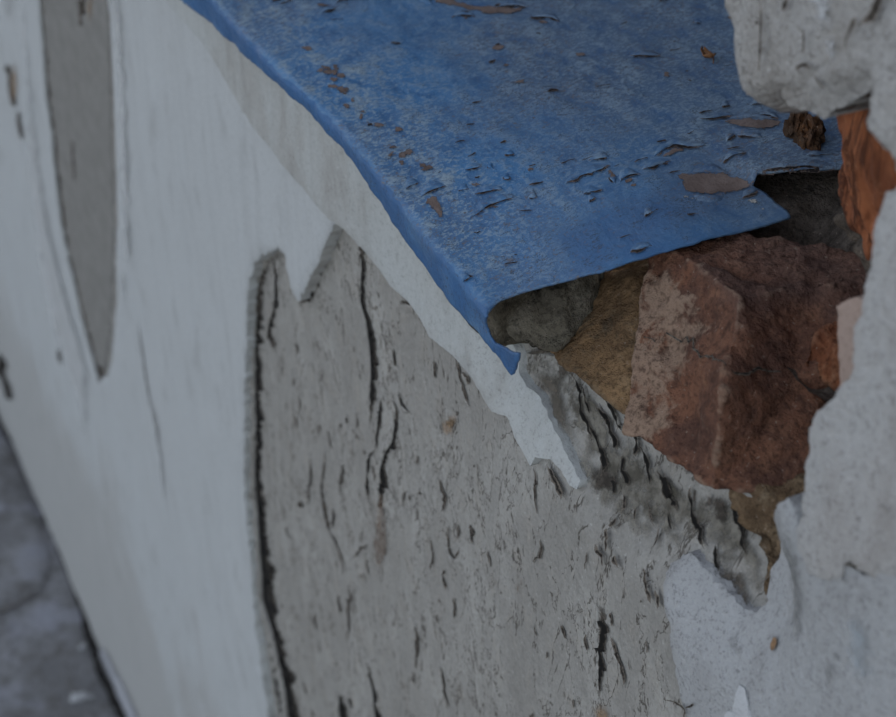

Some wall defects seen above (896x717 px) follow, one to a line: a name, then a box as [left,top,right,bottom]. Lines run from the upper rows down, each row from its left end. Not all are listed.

peeling [421,0,525,14]
peeling [316,64,354,108]
peeling [426,196,442,217]
peeling [678,163,754,203]
peeling [836,295,864,388]
crack [248,251,381,717]
crack [296,240,410,639]
crack [430,359,471,428]
crack [512,460,577,515]
crack [567,374,747,608]
crack [410,477,490,683]
crack [560,602,648,698]